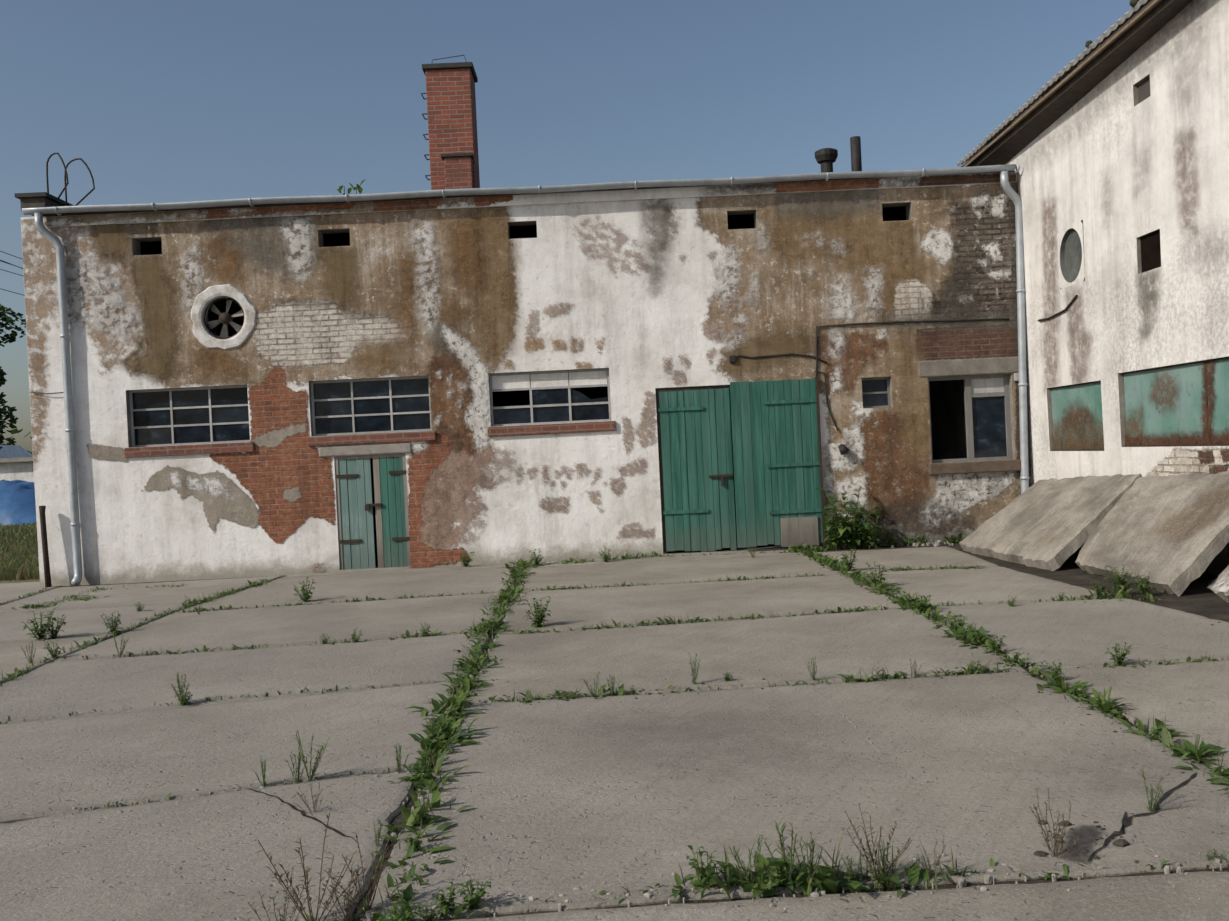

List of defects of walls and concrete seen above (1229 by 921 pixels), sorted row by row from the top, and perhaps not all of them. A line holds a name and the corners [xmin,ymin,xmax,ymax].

leakage [1178,133,1196,227]
leakage [642,199,669,282]
leakage [65,224,203,378]
peeling [21,195,657,568]
leakage [357,221,483,371]
peeling [663,355,691,385]
peeling [696,173,1031,534]
peeling [1044,205,1056,385]
rust [1052,405,1104,450]
leakage [1068,296,1089,383]
leakage [1139,273,1157,335]
rust [1125,361,1229,447]